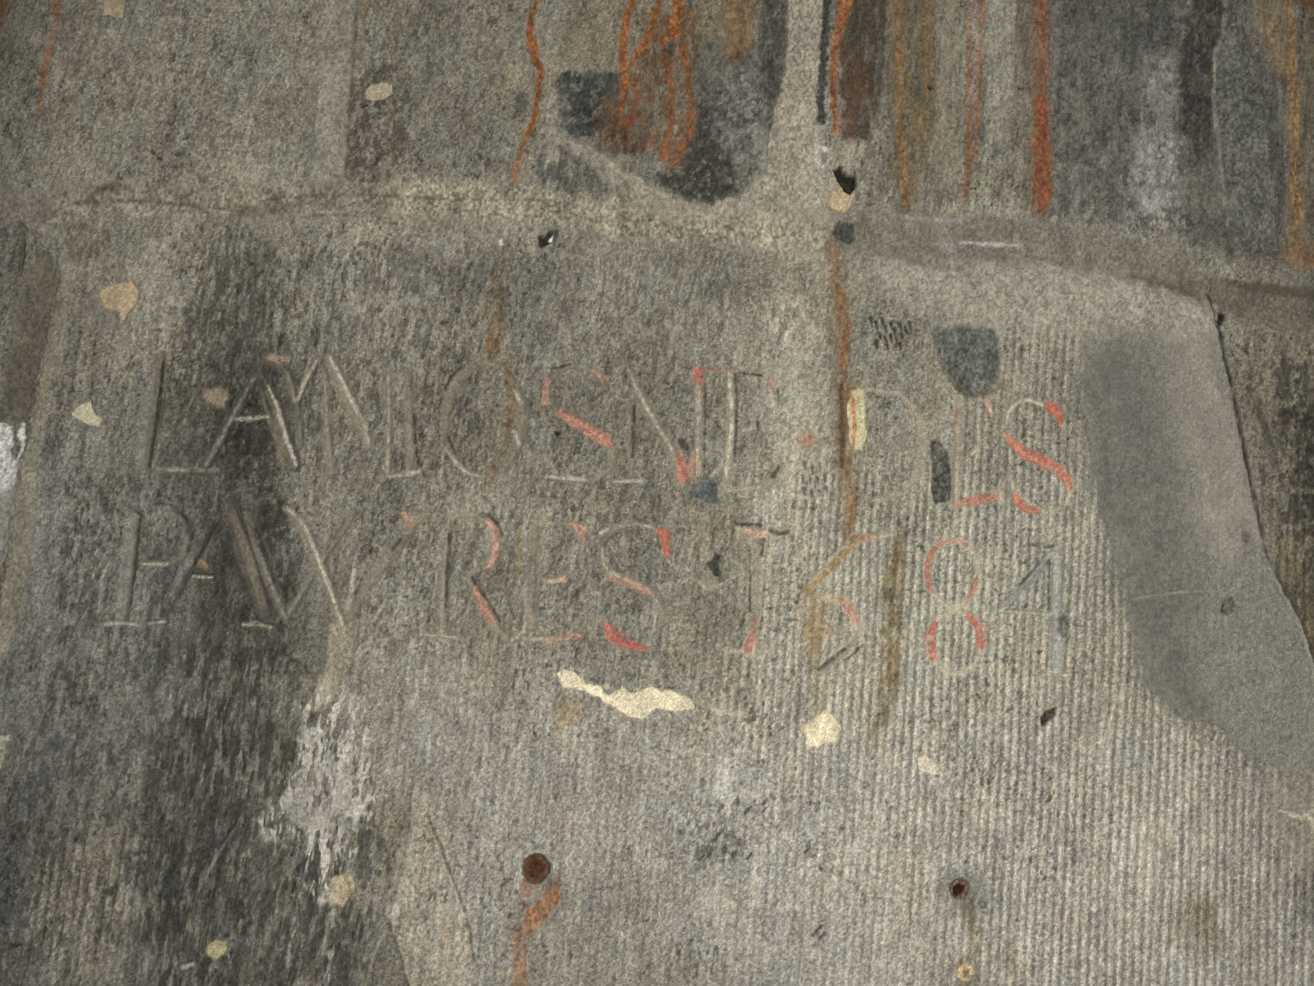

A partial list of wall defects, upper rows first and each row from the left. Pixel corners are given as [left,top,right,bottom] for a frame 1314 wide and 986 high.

rust [512,0,544,185]
rust [599,0,694,165]
rust [1032,0,1052,215]
spalling [97,281,139,320]
spalling [558,670,694,720]
spalling [801,712,841,746]
rust [514,884,561,986]